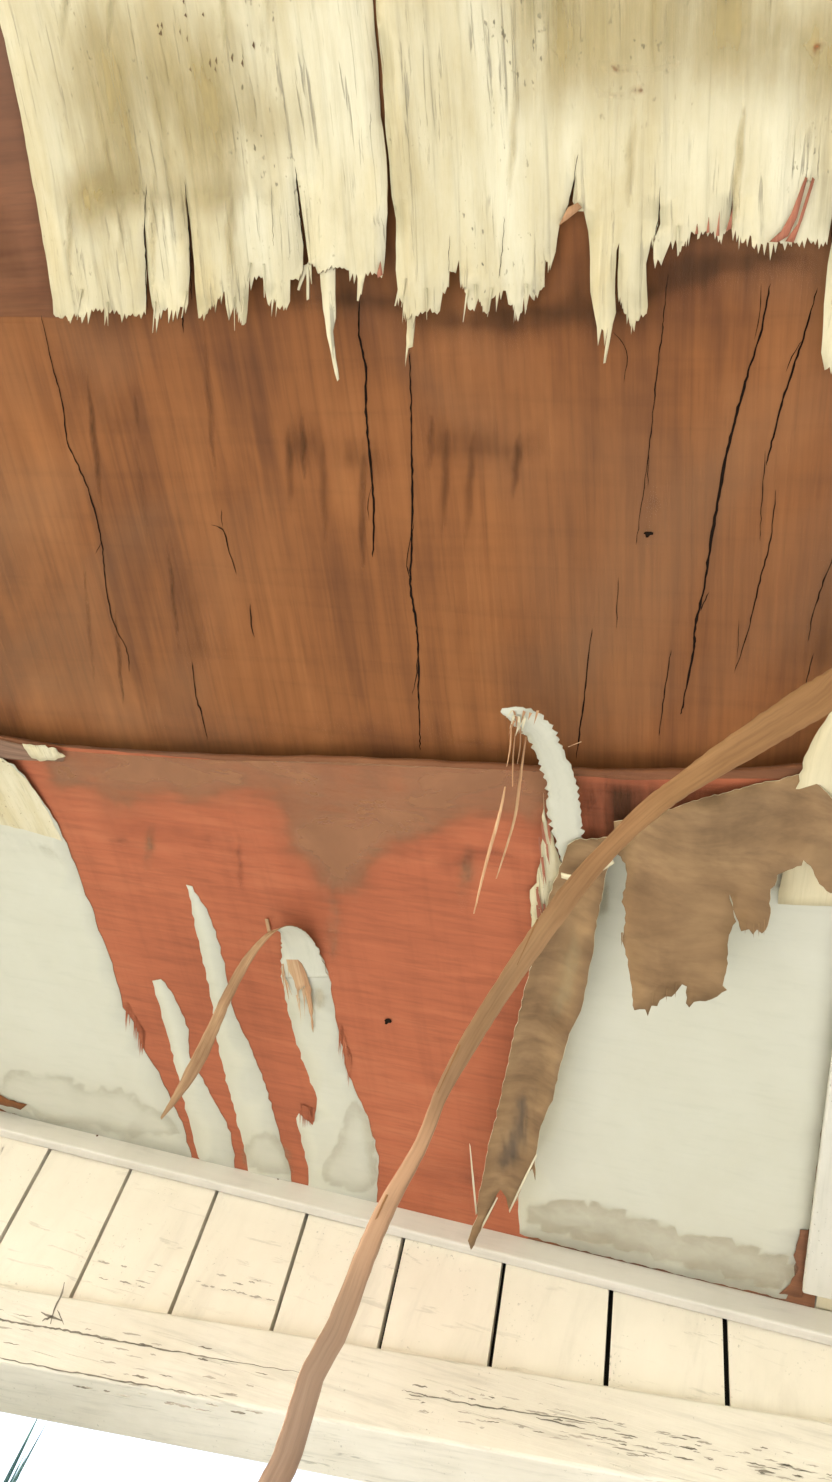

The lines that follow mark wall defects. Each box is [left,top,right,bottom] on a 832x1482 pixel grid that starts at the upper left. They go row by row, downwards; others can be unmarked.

crack [41,315,129,661]
crack [358,302,421,749]
peeling [0,25,832,1202]
crack [576,577,619,757]
crack [614,278,668,543]
crack [659,284,818,734]
crack [806,560,832,683]